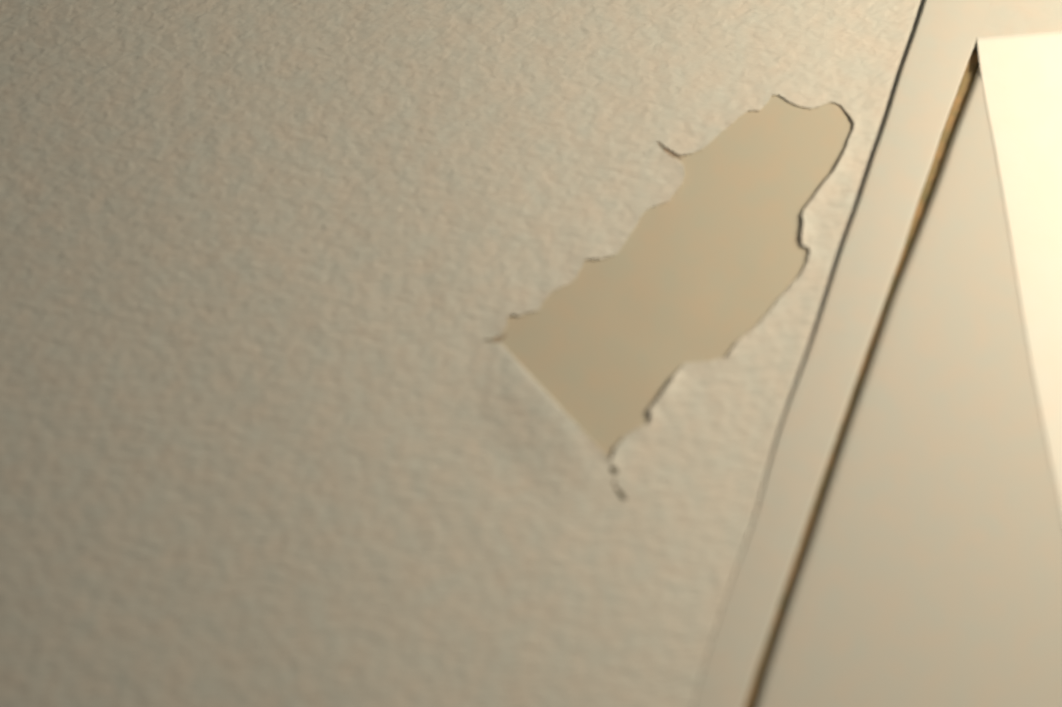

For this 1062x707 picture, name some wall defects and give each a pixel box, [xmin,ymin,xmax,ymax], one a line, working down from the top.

peeling [447,71,873,529]